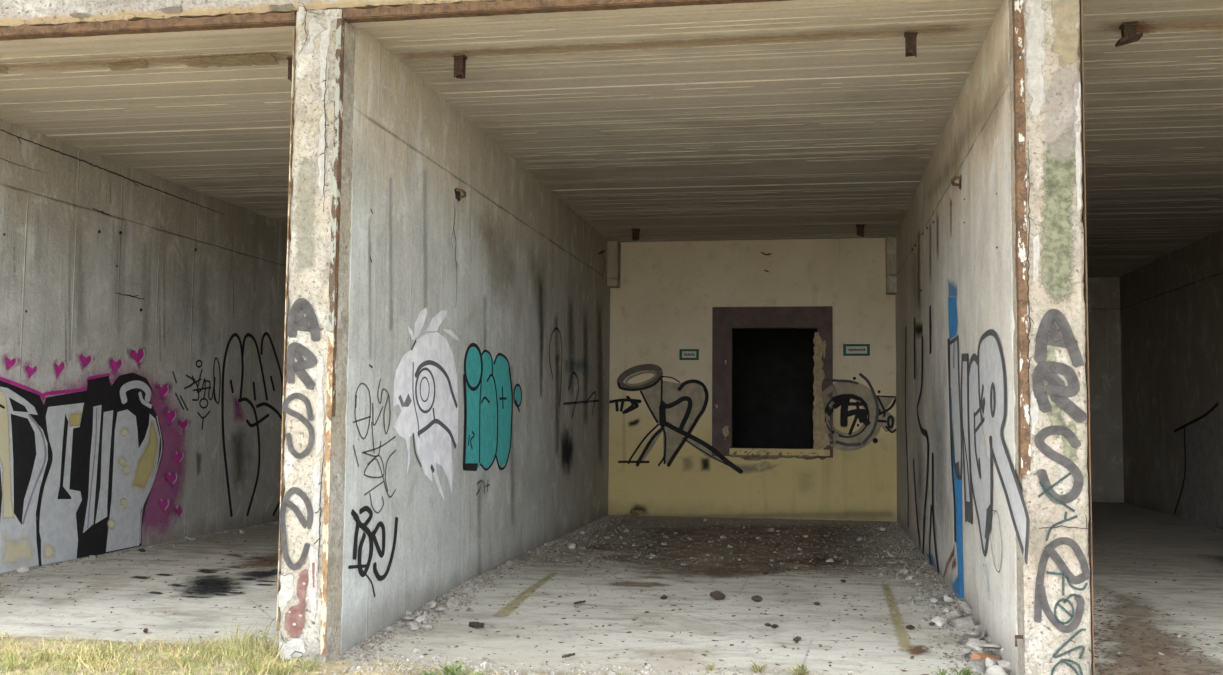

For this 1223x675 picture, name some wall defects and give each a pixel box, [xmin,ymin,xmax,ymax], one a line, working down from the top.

spalling [160,6,182,14]
peeling [269,4,331,197]
rust [411,27,953,58]
leakage [1041,125,1076,302]
peeling [278,356,324,660]